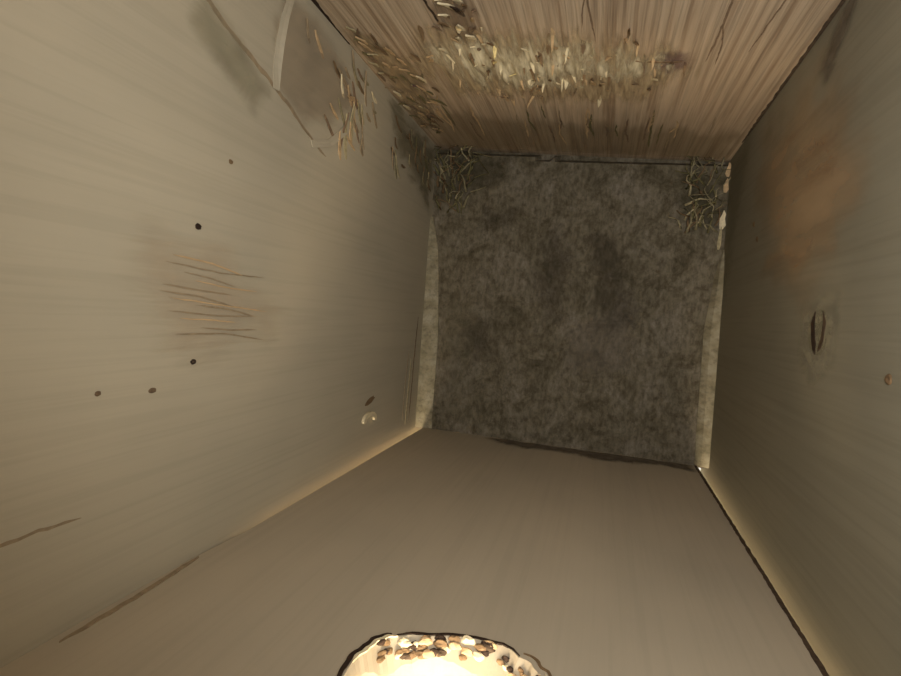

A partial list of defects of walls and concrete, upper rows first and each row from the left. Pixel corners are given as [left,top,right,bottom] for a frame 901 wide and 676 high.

crack [206,0,326,157]
spalling [418,0,687,108]
crack [0,518,80,548]
spalling [337,631,552,676]